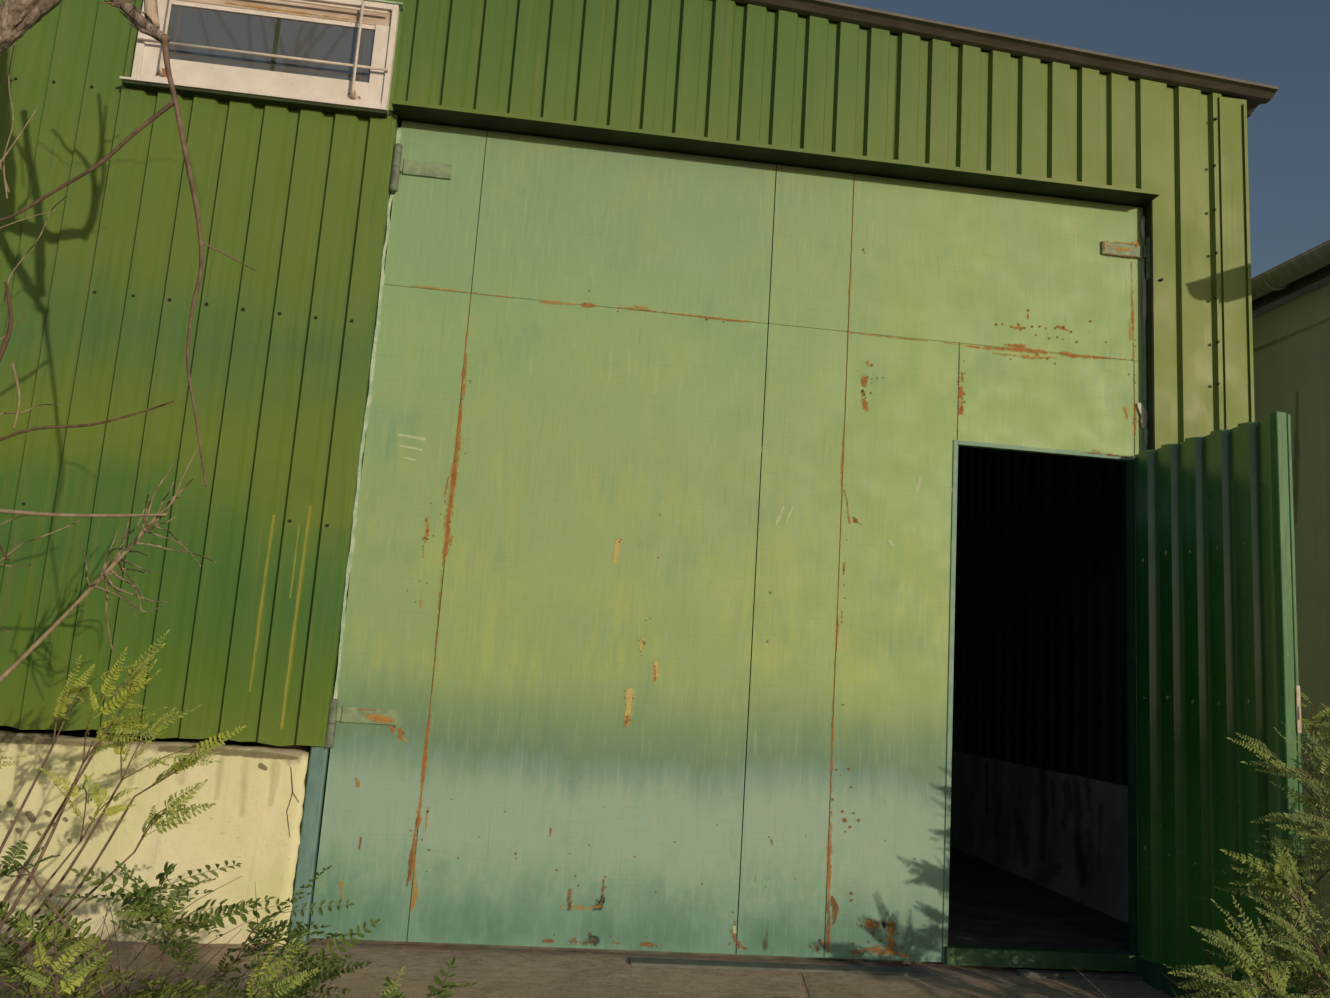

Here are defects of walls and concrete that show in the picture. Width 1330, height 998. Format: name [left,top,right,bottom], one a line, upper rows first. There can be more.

corrosion [540,290,596,308]
corrosion [617,305,750,323]
corrosion [845,180,926,411]
corrosion [944,240,1142,433]
corrosion [405,285,511,912]
corrosion [809,419,862,953]
corrosion [357,709,407,742]
corrosion [561,875,607,911]
corrosion [852,919,910,958]